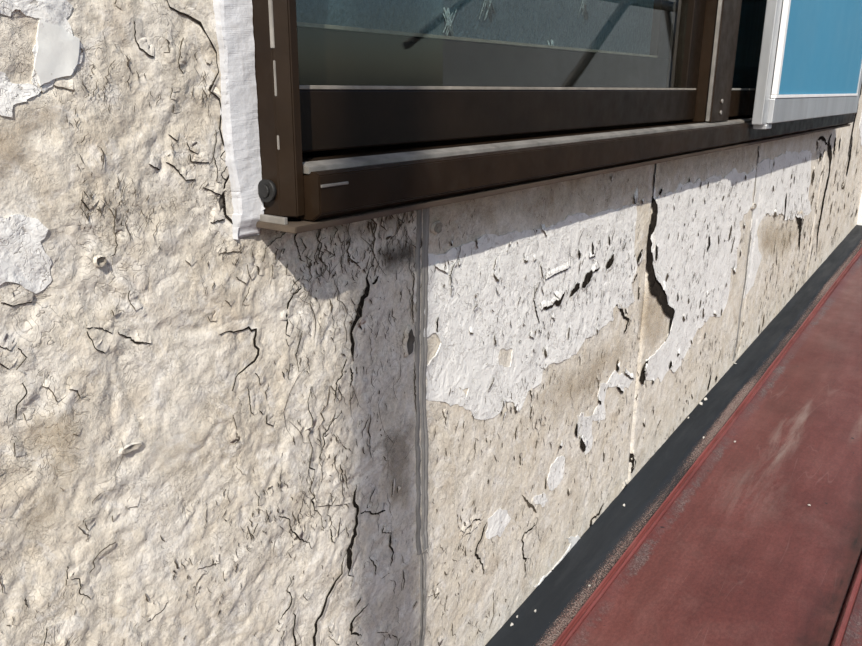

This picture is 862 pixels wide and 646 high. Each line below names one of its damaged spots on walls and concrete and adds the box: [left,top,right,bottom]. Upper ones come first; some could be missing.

peeling [0,0,83,118]
peeling [0,214,52,294]
crack [0,290,88,420]
crack [86,291,152,354]
peeling [403,204,637,420]
peeling [577,370,633,455]
peeling [646,150,812,382]
crack [0,438,140,646]